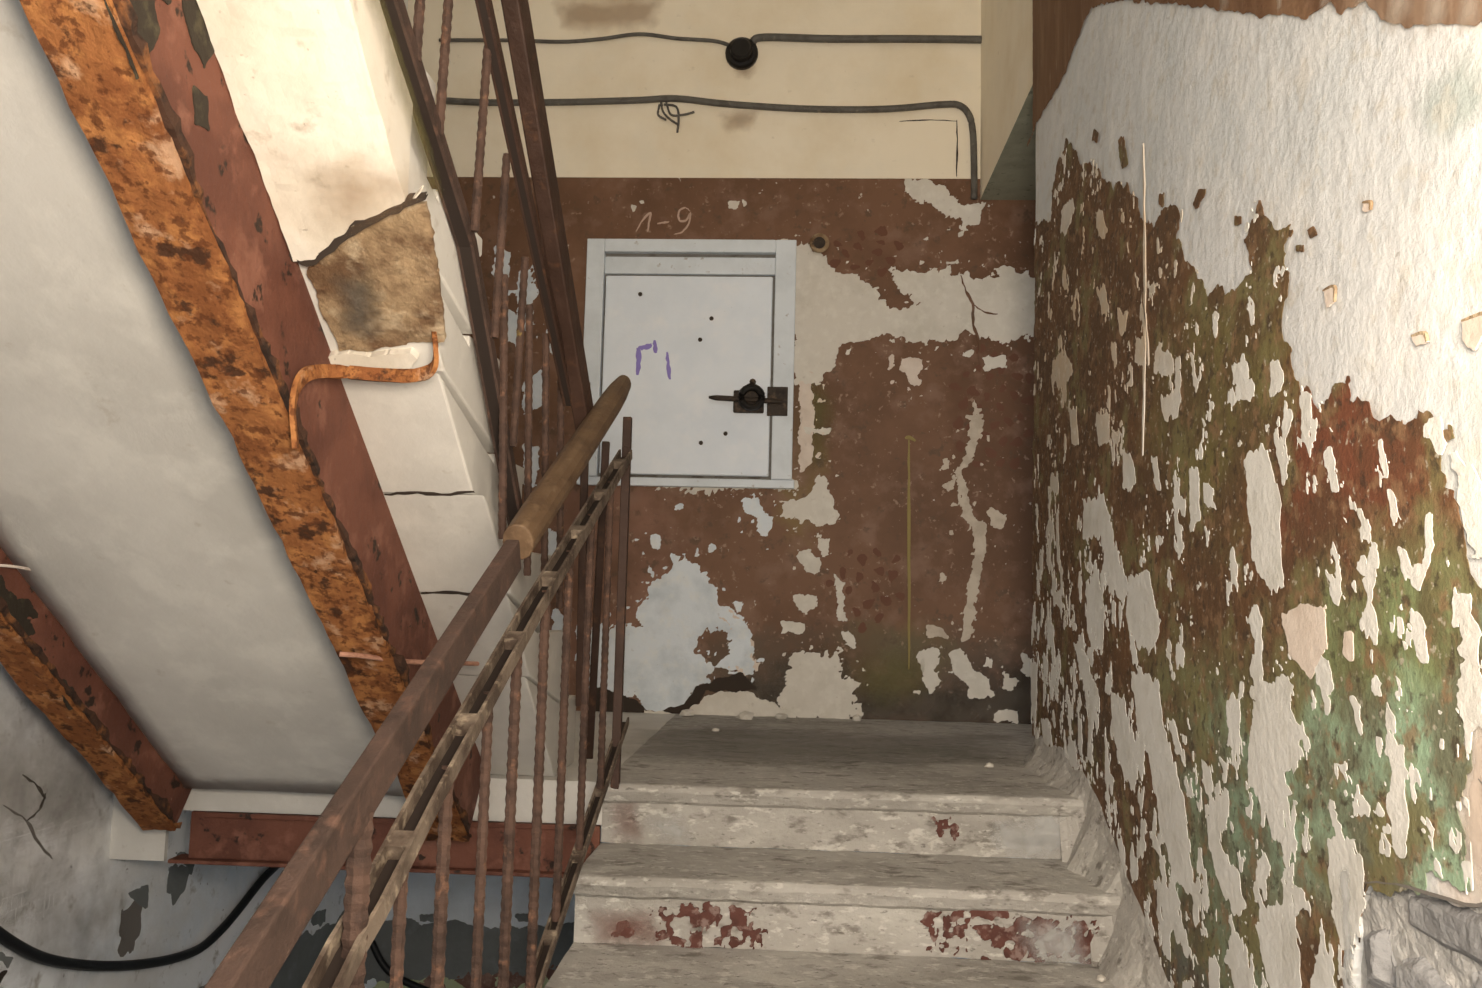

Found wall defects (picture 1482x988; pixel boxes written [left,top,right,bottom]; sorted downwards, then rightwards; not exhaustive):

peeling [1027,0,1482,146]
corrosion [112,0,410,687]
flaking render [307,201,446,369]
peeling [551,129,1482,988]
corrosion [0,597,182,828]
crack [3,774,53,859]
corrosion [452,789,472,838]
flaking render [117,852,195,957]